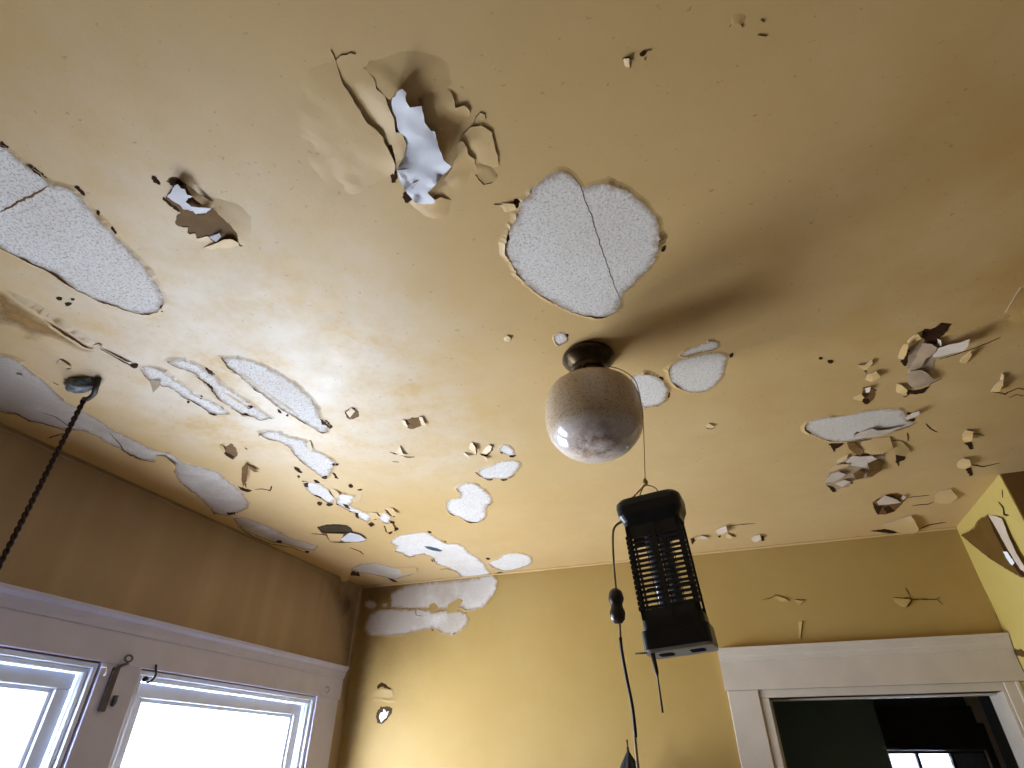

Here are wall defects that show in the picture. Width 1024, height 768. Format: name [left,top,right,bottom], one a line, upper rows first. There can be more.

peeling [296,50,499,219]
peeling [0,141,170,317]
peeling [151,176,251,250]
peeling [494,166,668,321]
peeling [629,338,734,409]
peeling [800,323,999,492]
peeling [0,353,533,638]
crack [893,589,942,608]
peeling [961,490,1024,578]